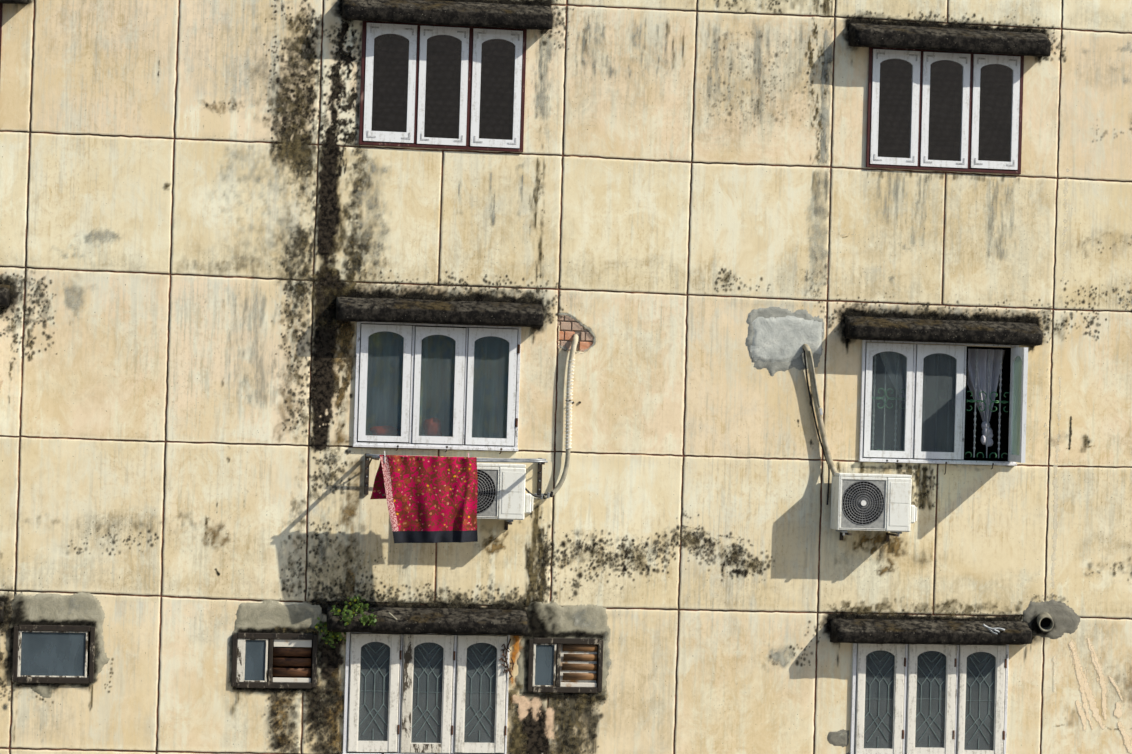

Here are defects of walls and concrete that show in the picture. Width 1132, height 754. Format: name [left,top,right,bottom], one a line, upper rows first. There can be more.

water stain [0,271,78,376]
water stain [264,0,387,605]
flaking render [558,313,596,353]
water stain [526,505,772,606]
water stain [264,632,346,754]
water stain [507,682,605,754]